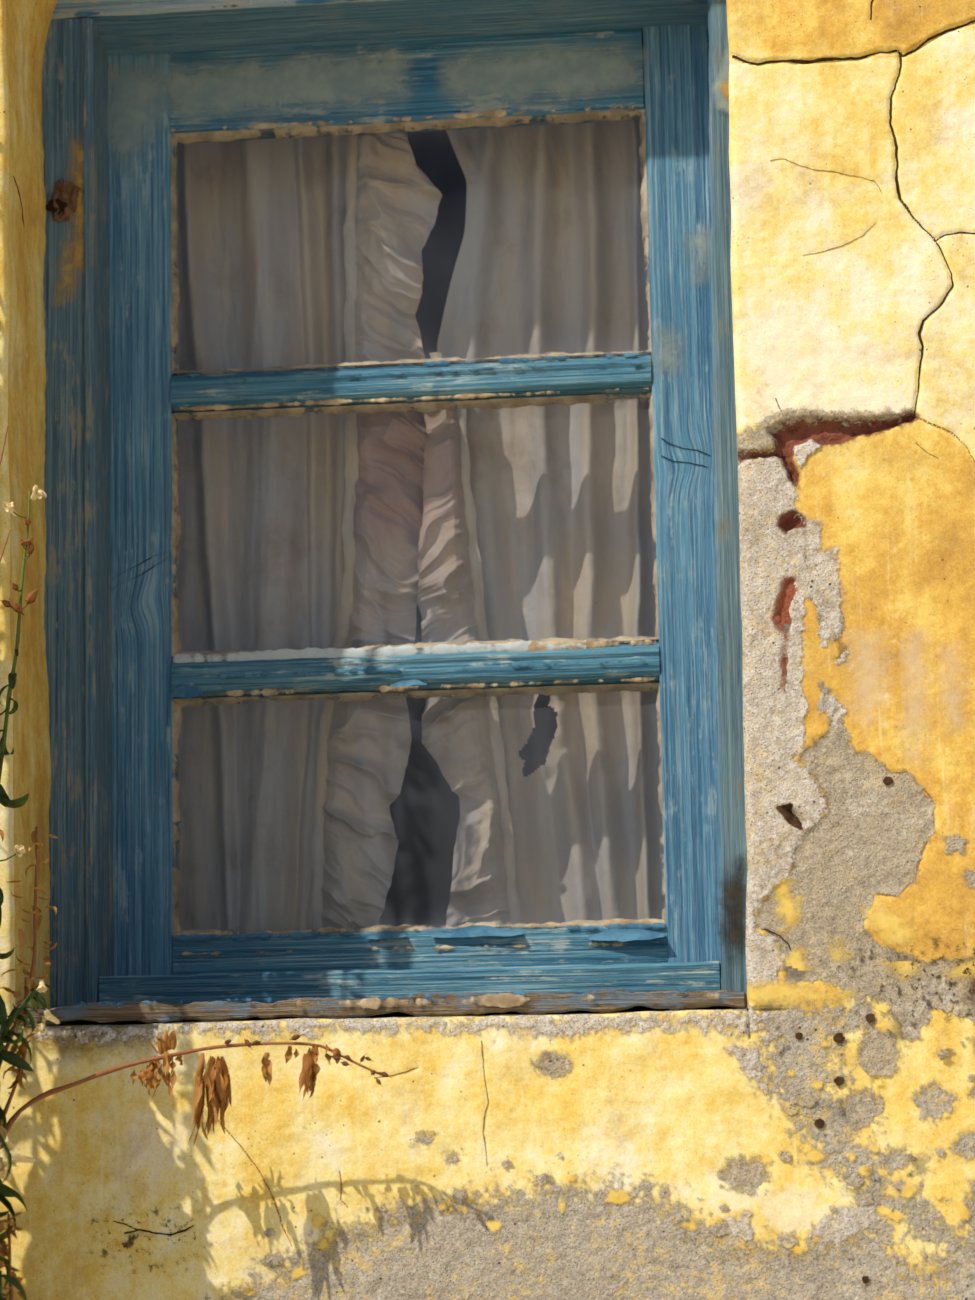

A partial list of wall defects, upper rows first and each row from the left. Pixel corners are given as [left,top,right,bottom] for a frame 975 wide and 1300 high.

crack [732,20,975,463]
peeling [34,407,975,1300]